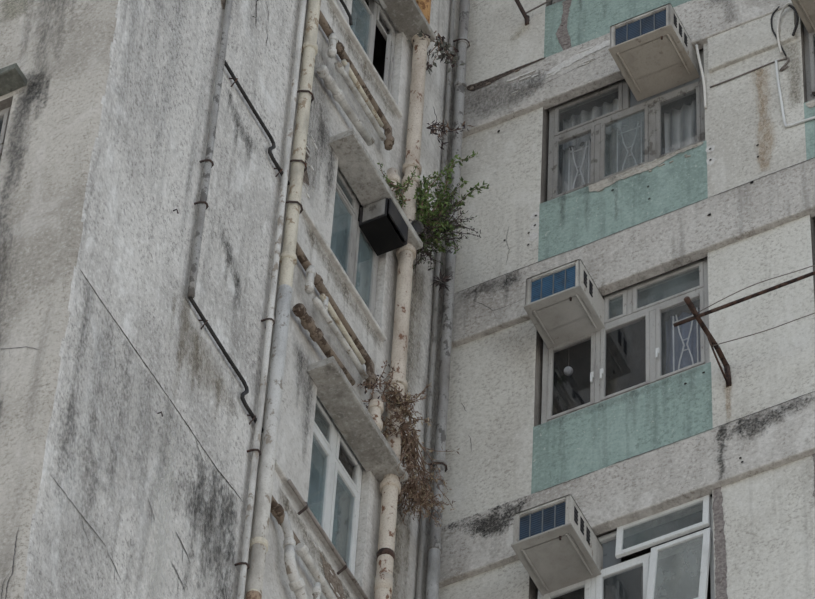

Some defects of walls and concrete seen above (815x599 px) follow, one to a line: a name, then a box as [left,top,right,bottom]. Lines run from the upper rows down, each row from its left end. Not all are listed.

peeling [467,40,610,94]
peeling [588,142,703,192]
damp [717,398,812,479]
damp [449,501,525,536]
crack [1,528,19,599]